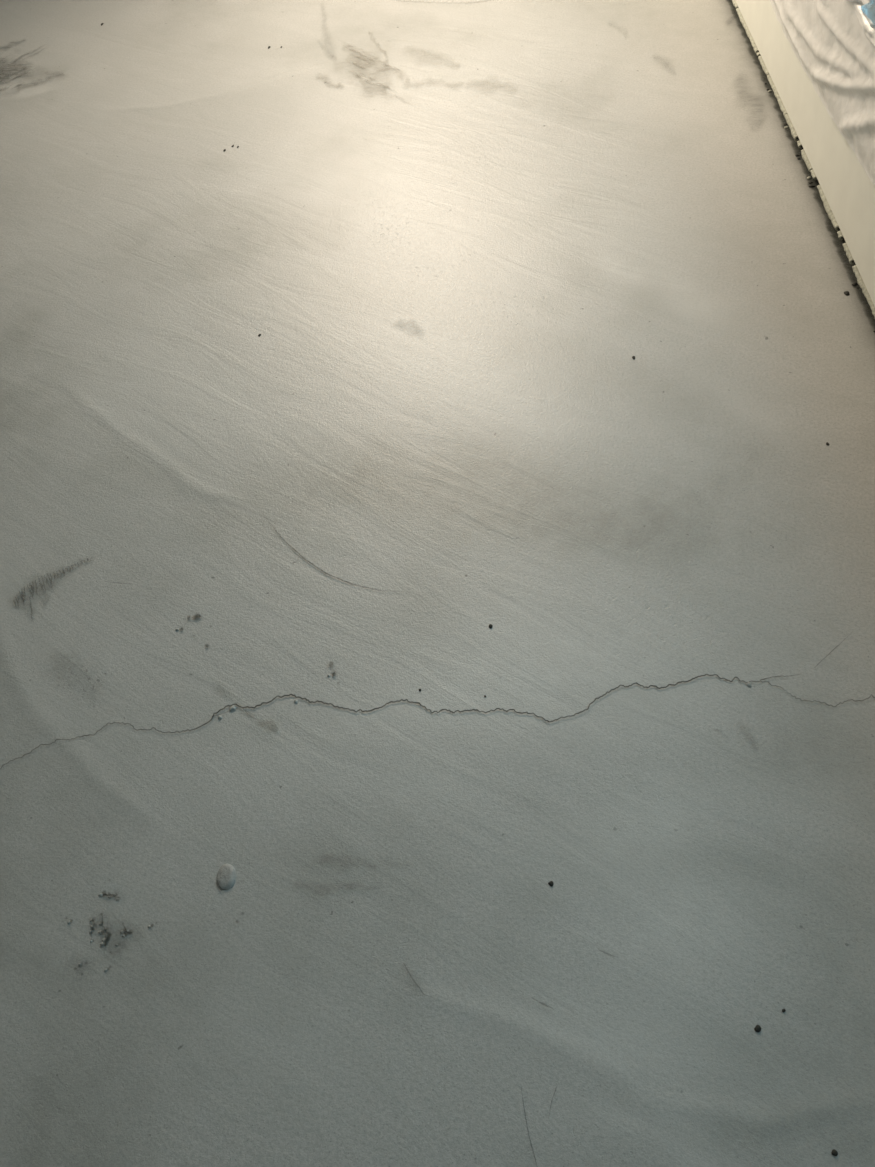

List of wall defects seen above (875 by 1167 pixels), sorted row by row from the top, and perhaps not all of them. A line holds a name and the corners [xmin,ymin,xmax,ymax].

crack [1,674,875,768]